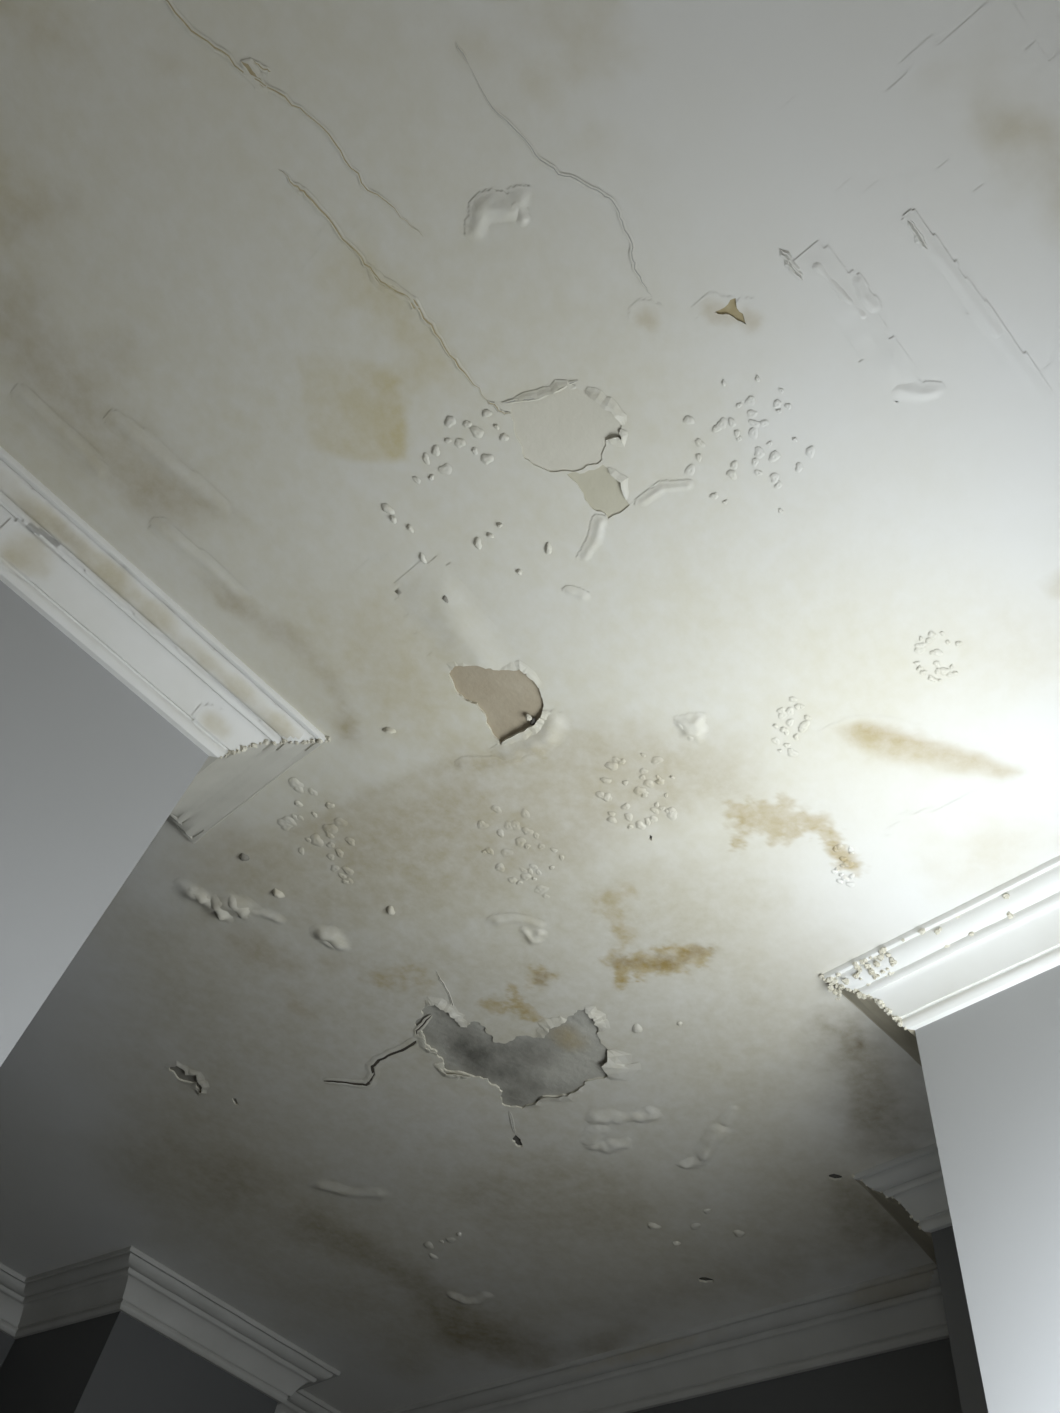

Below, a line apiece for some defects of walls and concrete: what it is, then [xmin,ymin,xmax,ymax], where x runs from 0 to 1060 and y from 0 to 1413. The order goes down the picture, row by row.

crack [162,0,423,237]
crack [456,43,652,297]
crack [279,170,578,415]
peeling [691,291,773,344]
water stain [0,0,1060,944]
flaking render [445,660,571,773]
crack [323,971,460,1090]
water stain [0,831,937,1400]
flaking render [414,996,642,1147]